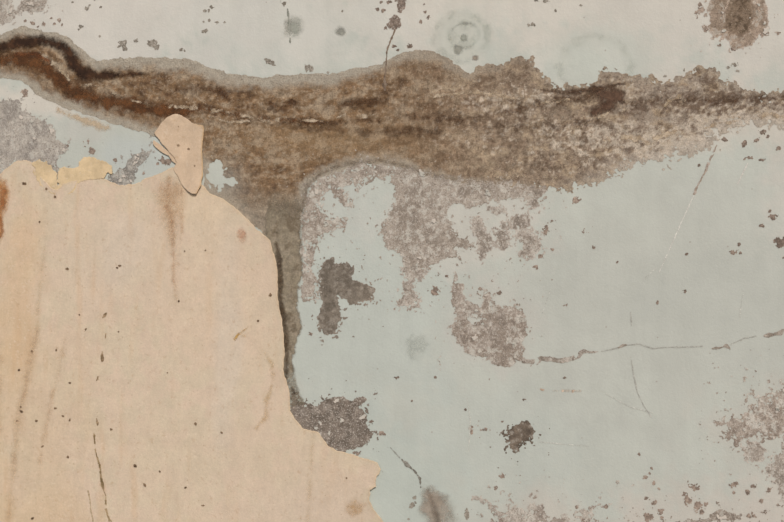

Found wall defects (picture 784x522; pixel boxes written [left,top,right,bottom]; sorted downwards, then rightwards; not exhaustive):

spalling [117,38,160,58]
water stain [375,0,406,30]
peeling [0,86,386,522]
water stain [0,26,784,406]
spalling [293,149,582,367]
crack [521,312,784,417]
crack [659,145,717,272]
spalling [470,420,541,462]
spalling [468,467,612,522]
spalling [619,368,784,522]